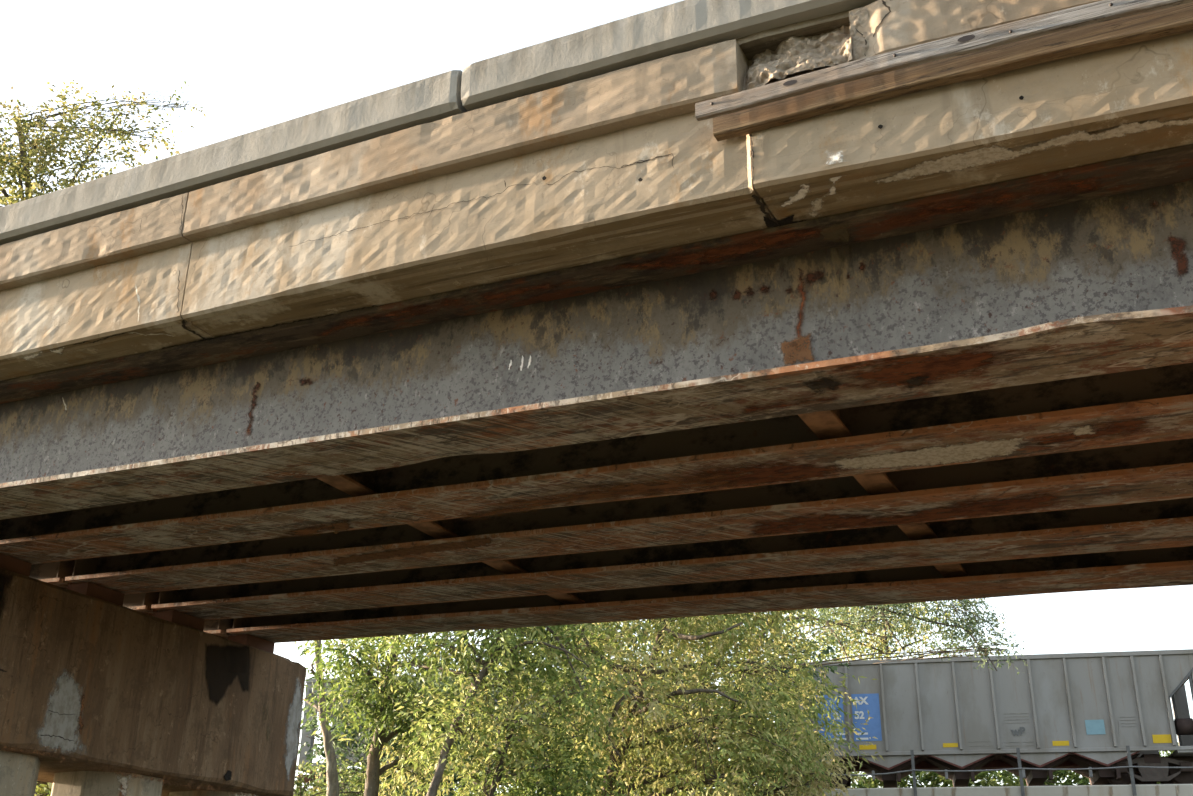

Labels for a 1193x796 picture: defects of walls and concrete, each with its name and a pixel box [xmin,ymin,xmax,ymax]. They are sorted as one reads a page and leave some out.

spalling [742,7,873,91]
crack [295,153,674,246]
crack [749,134,806,228]
corrosion [1167,236,1188,276]
corrosion [781,268,824,365]
corrosion [246,382,260,435]
peeling [38,672,84,751]
damp [205,644,250,705]